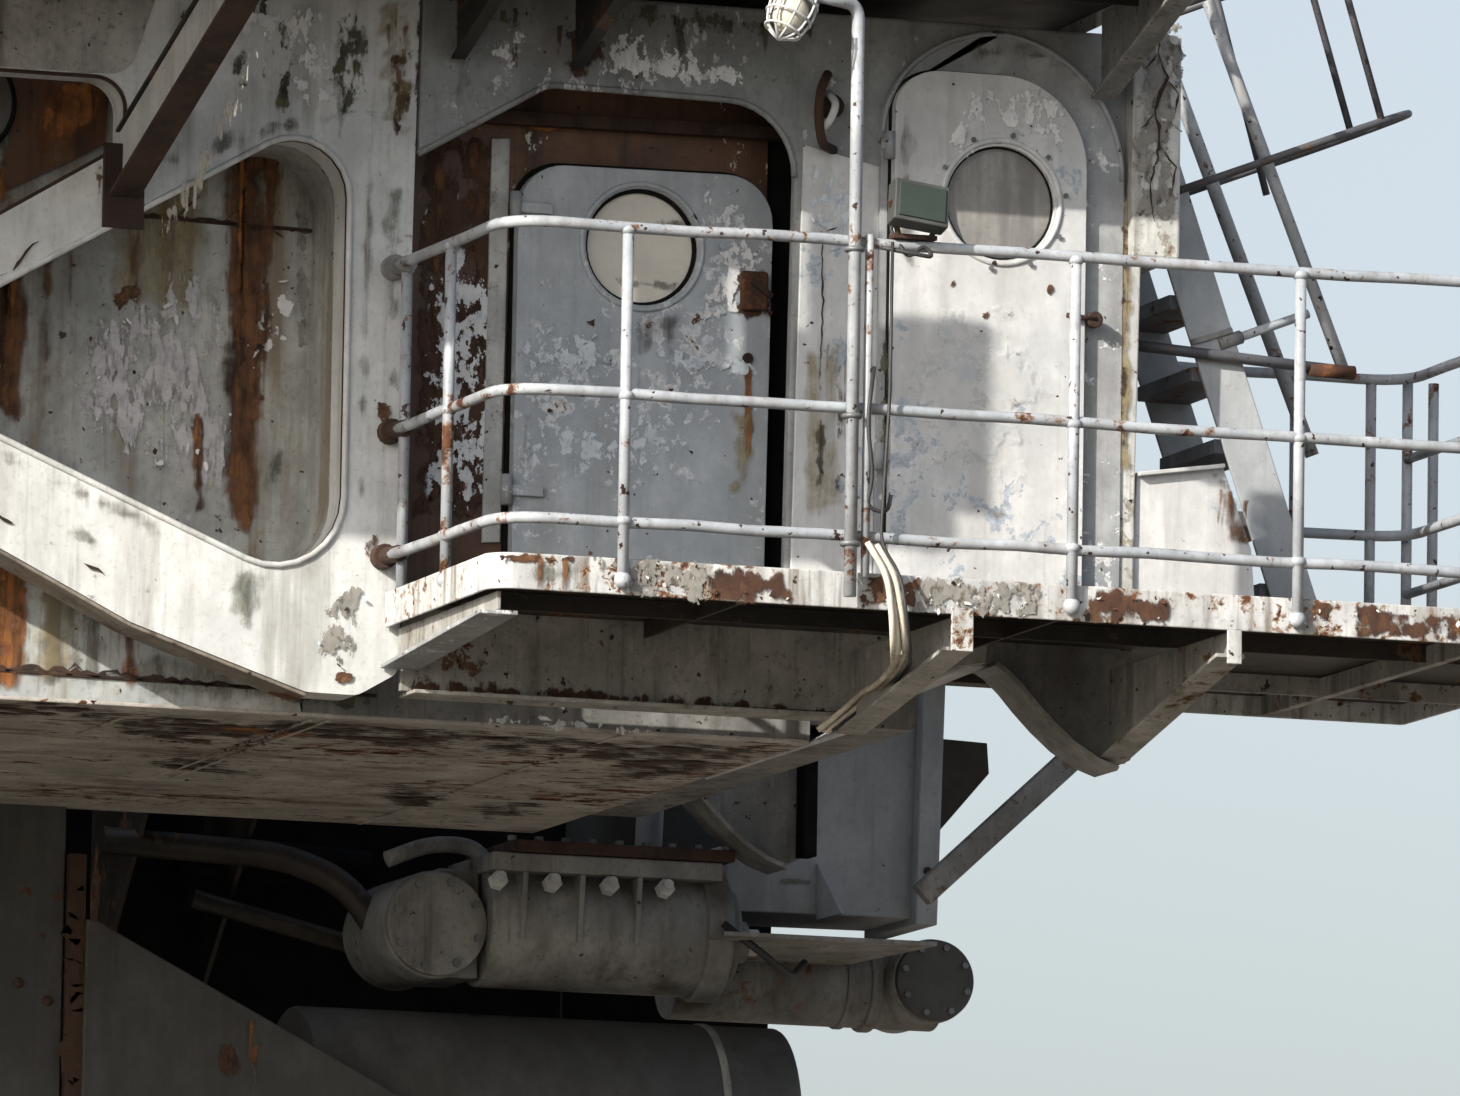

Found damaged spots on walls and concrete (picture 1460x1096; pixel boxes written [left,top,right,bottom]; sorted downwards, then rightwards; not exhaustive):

peeling [602,21,743,86]
crack [1141,43,1179,222]
peeling [72,268,232,490]
corrosion [223,157,280,533]
corrosion [413,137,491,519]
peeling [423,249,501,508]
peeling [519,325,693,481]
peeling [693,185,763,326]
corrosion [0,567,787,788]
corrosion [500,551,798,605]
corrosion [1084,588,1171,624]
corrosion [1354,604,1460,642]